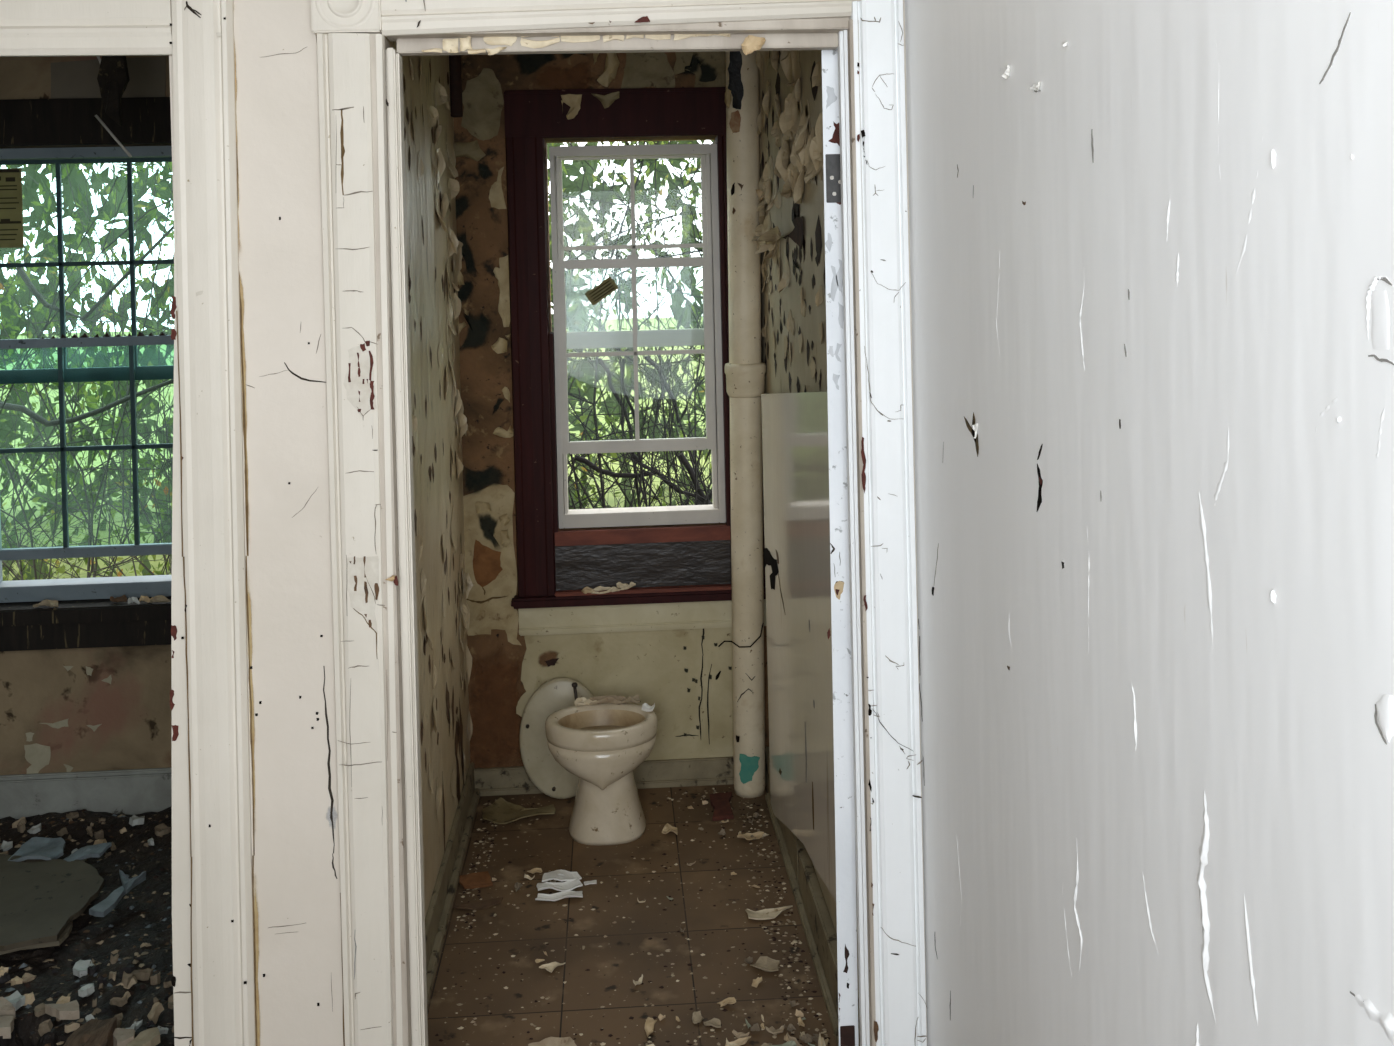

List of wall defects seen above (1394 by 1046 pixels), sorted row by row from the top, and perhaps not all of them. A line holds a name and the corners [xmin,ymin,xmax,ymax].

crack [1319,12,1351,84]
spalling [344,327,377,418]
peeling [404,16,844,853]
peeling [24,719,73,774]
crack [323,641,397,1046]